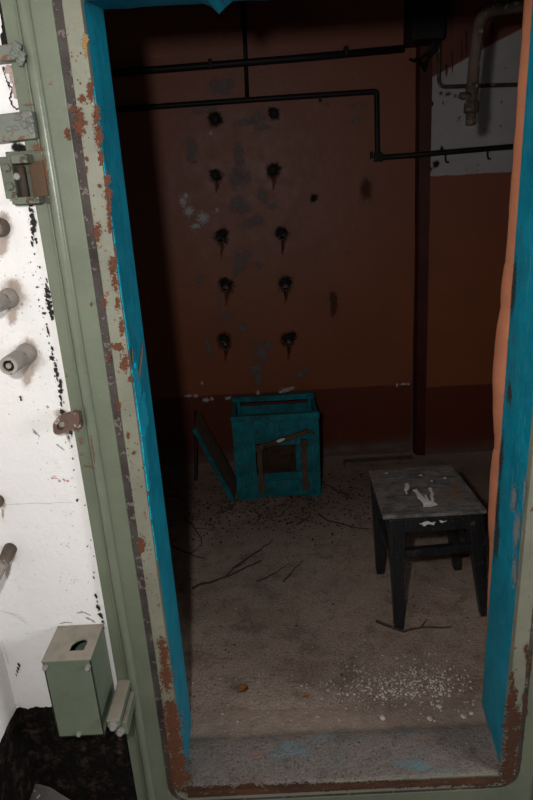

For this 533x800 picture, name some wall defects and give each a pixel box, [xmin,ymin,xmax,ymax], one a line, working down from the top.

corrosion [64,73,113,242]
corrosion [90,250,133,383]
corrosion [156,627,528,798]